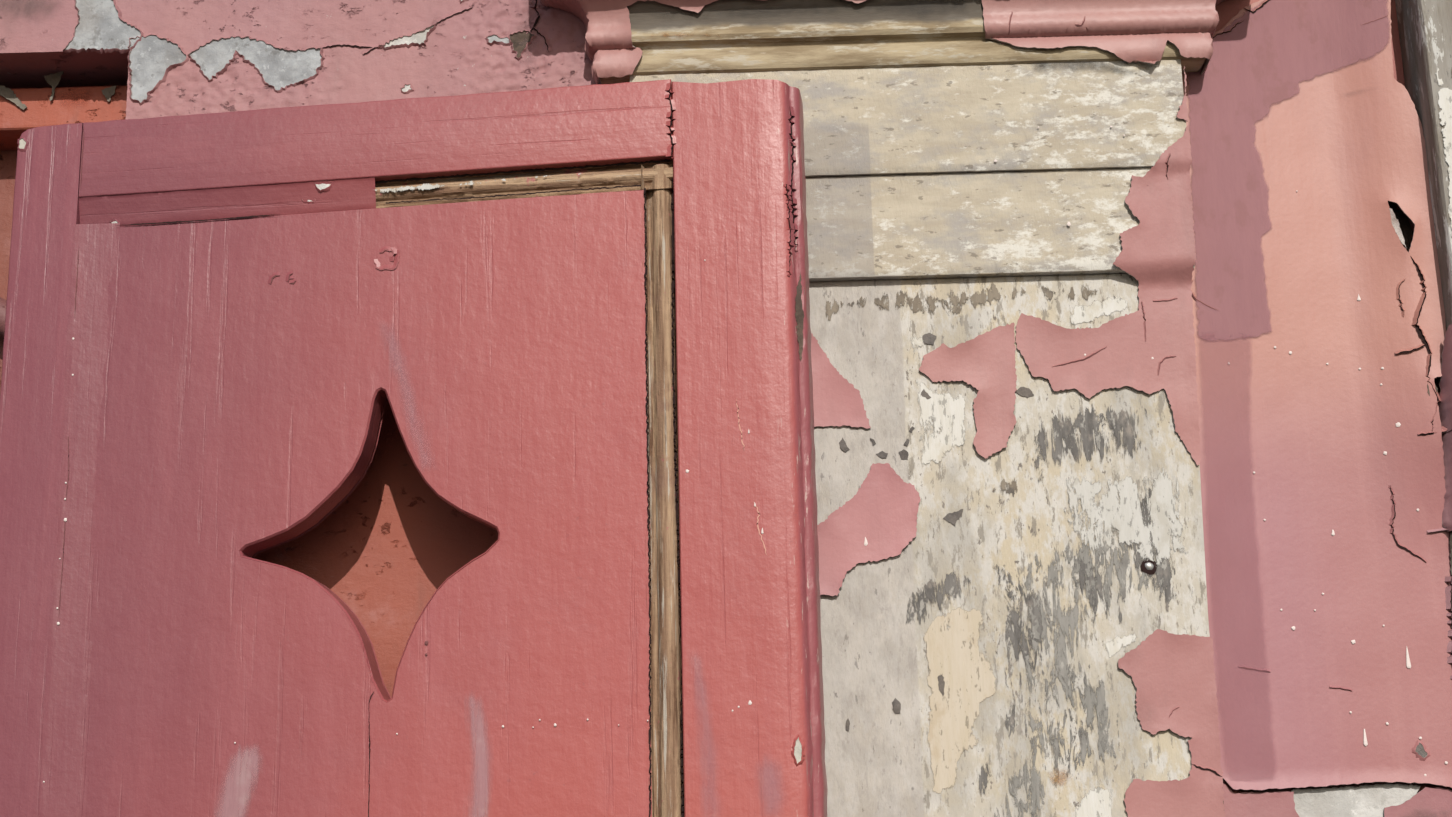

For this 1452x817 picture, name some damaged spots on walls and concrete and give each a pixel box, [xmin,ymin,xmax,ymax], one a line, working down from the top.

peeling [63,0,325,106]
peeling [1389,208,1407,249]
crack [1395,255,1452,435]
peeling [795,66,1226,817]
crack [1388,485,1452,679]
crack [1192,764,1452,793]
peeling [1291,782,1421,817]